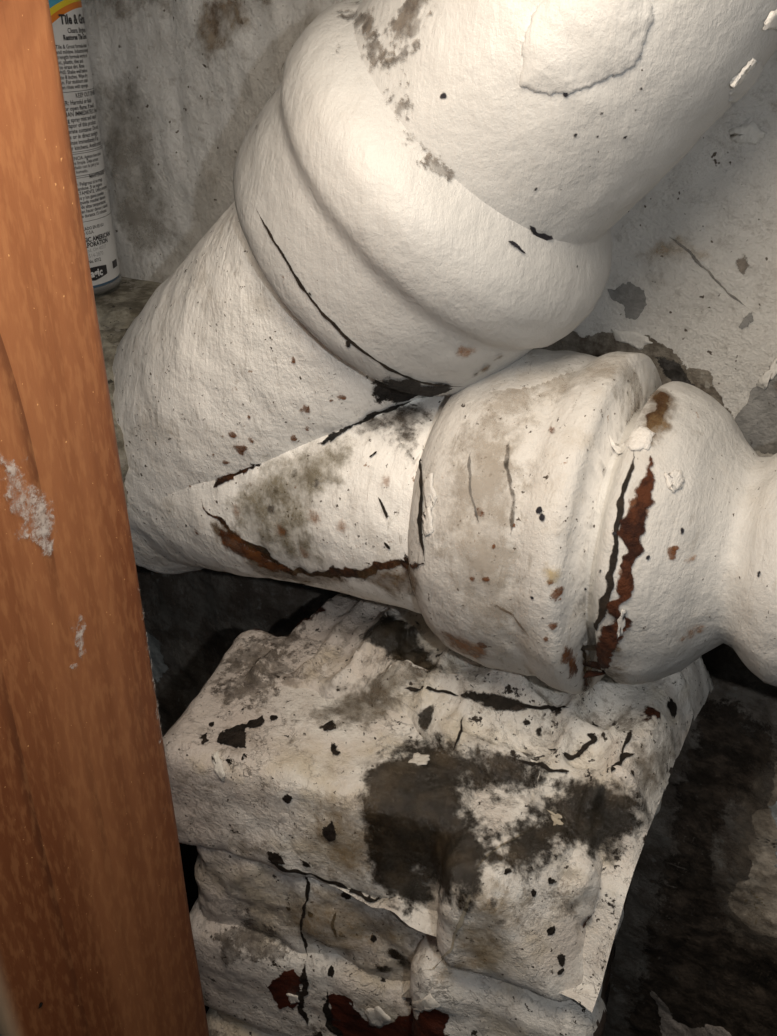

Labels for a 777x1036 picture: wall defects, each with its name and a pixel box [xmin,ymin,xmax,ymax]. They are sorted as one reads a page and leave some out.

peeling [762,9,777,31]
crack [257,211,464,387]
flaking render [535,282,777,454]
rust [212,432,261,487]
rust [202,505,424,594]
water stain [236,377,453,558]
rust [562,390,685,693]
crack [268,861,391,956]
water stain [317,706,664,923]
peeling [557,954,566,975]
water stain [625,697,777,1036]
peeling [723,753,777,950]